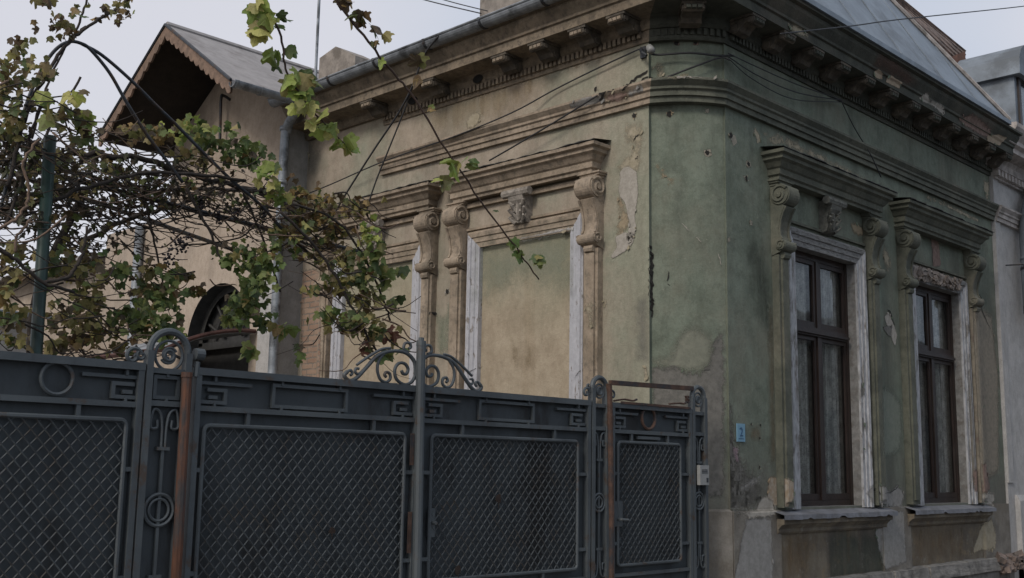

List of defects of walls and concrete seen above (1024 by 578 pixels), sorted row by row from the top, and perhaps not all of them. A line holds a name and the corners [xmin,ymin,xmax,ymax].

peeling [611,167,638,258]
crack [648,245,670,317]
peeling [885,312,897,345]
flaking render [643,334,795,519]